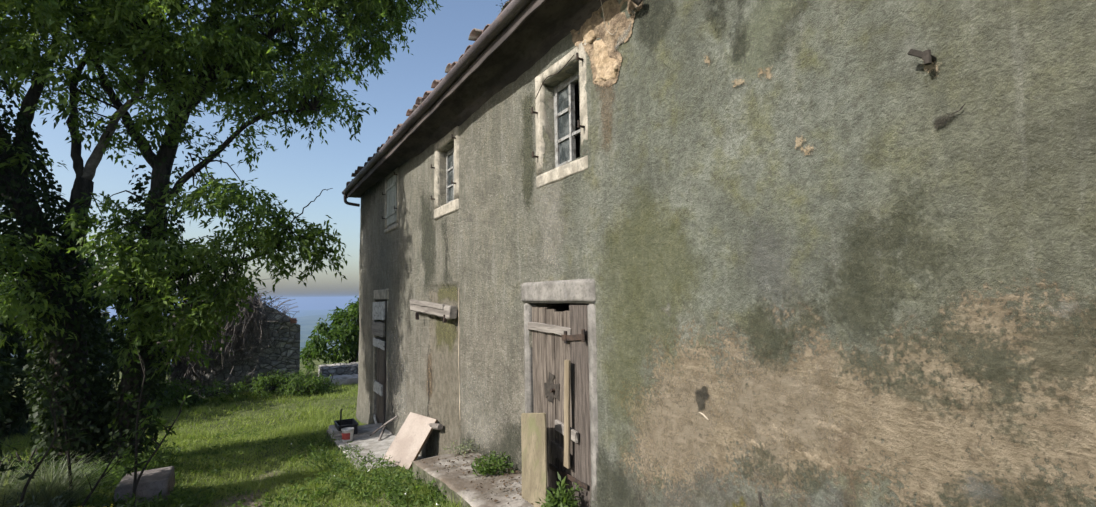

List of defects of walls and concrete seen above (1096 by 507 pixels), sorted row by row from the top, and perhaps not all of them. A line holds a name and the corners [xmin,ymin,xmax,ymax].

flaking render [570,0,644,87]
damp [639,0,673,47]
damp [706,0,799,76]
damp [520,94,535,212]
flaking render [795,135,814,156]